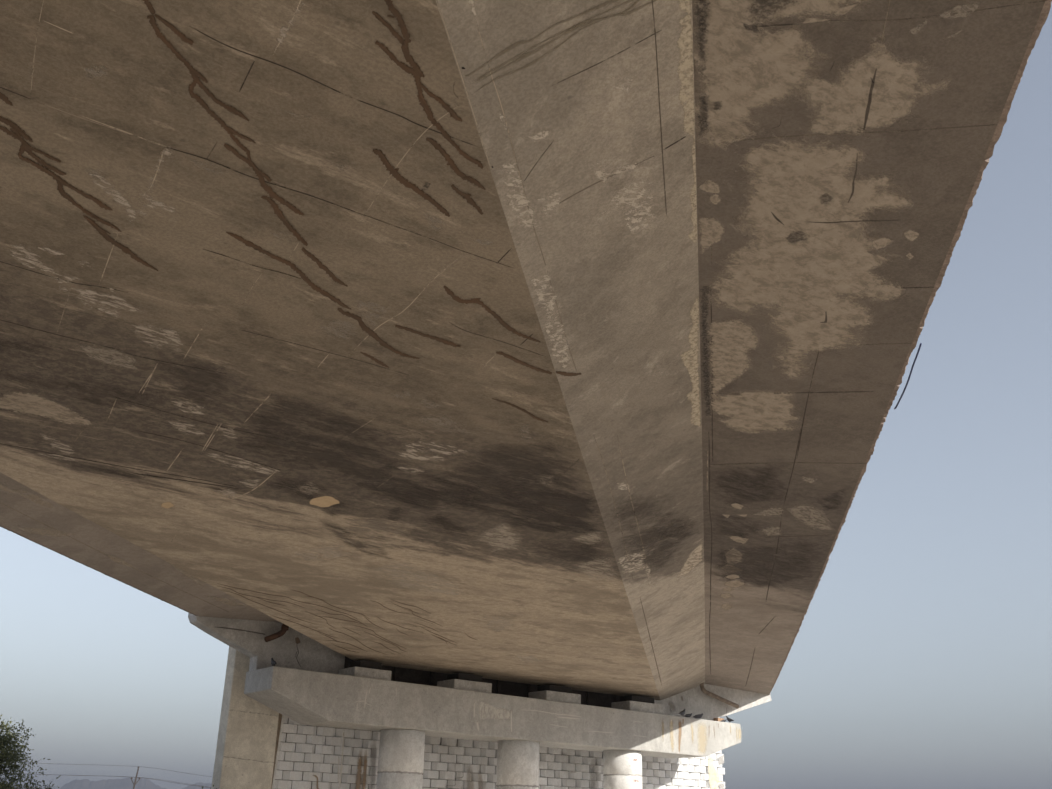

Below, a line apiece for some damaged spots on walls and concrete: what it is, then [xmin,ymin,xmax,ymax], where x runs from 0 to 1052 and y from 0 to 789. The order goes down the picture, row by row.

crack [372,0,485,217]
crack [0,92,158,271]
crack [143,0,461,368]
crack [444,286,581,376]
efflorescence [169,401,206,436]
crack [492,398,548,422]
spalling [310,496,339,507]
damp [207,400,651,585]
damp [679,544,702,576]
crack [217,583,476,667]
corrosion [355,755,367,789]